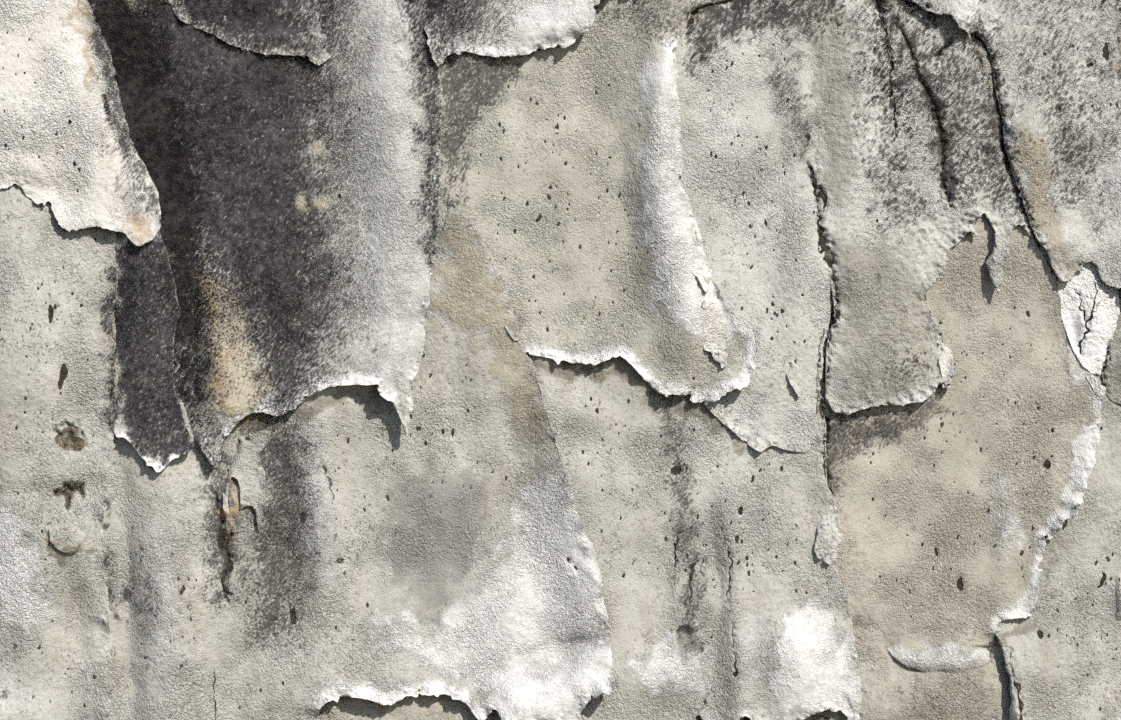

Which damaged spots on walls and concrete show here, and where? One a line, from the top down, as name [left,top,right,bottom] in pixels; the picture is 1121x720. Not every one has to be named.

water stain [631,53,754,346]
water stain [682,0,1121,268]
peeling [912,0,979,44]
crack [876,0,1040,246]
peeling [132,288,185,374]
water stain [87,0,685,657]
crack [809,165,841,494]
water stain [832,245,939,404]
crack [1075,282,1121,406]
water stain [367,396,709,720]
water stain [887,642,990,672]
water stain [1045,420,1100,539]